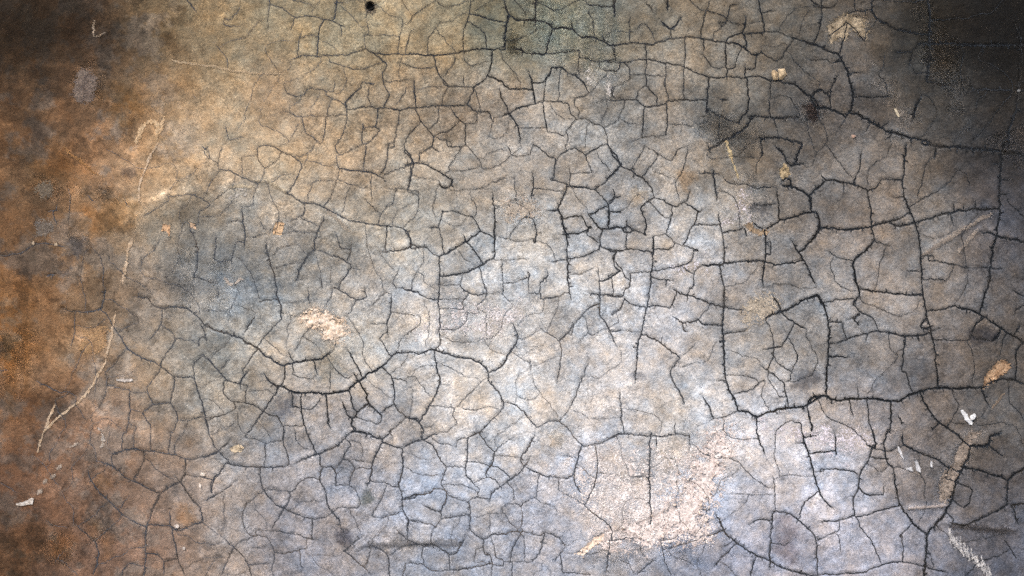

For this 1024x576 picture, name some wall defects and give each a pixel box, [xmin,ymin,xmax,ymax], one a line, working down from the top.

flaking render [827,12,870,43]
flaking render [298,304,355,346]
crack [37,125,690,576]
crack [255,0,1024,576]